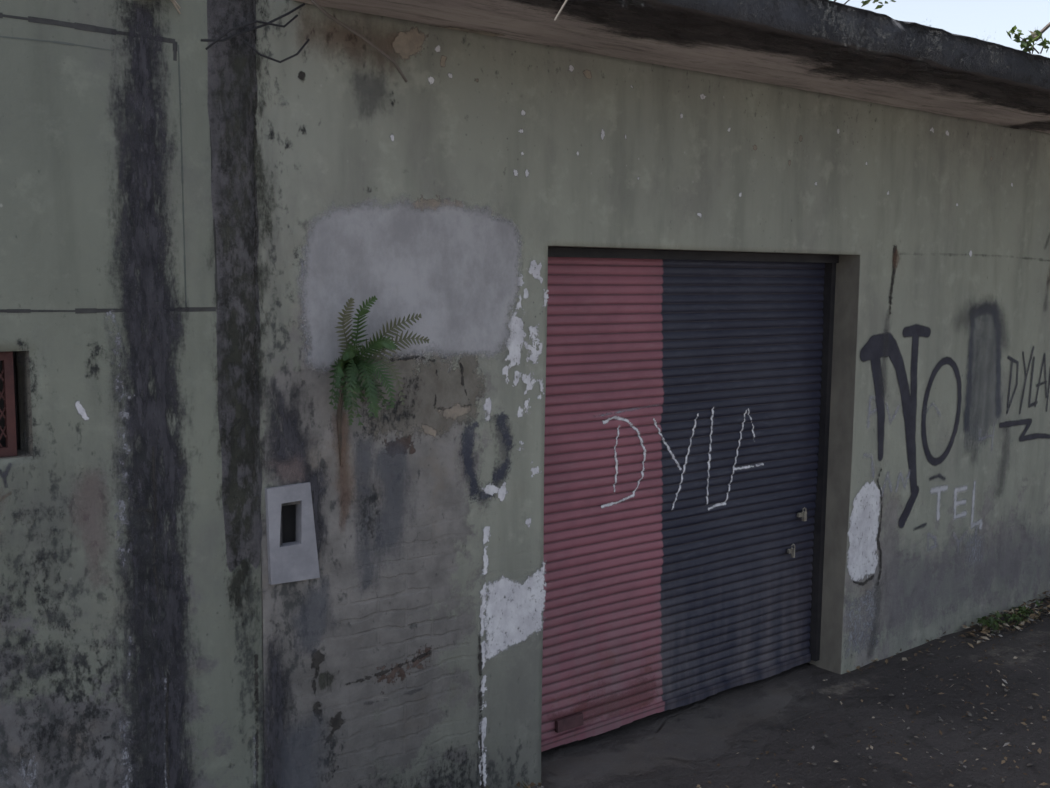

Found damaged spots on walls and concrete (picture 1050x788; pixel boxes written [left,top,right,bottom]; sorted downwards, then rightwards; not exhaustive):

damp [514,0,1050,132]
damp [0,1,192,788]
damp [213,0,327,616]
peeling [482,482,508,502]
peeling [502,258,549,417]
peeling [478,526,491,788]